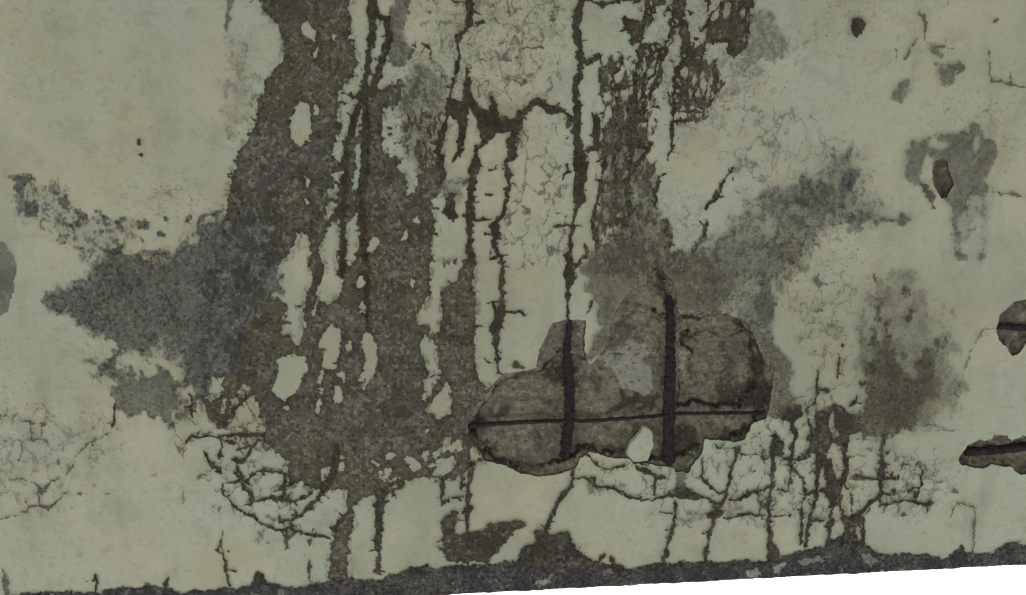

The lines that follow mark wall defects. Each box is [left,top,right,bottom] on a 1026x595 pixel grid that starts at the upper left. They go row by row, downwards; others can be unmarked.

crack [336,0,633,375]
water stain [580,0,797,417]
water stain [780,150,884,265]
water stain [906,124,998,261]
peeling [0,242,17,316]
spalling [996,300,1026,356]
crack [173,374,346,588]
water stain [373,540,385,575]
spalling [436,261,775,572]
crack [596,553,624,571]
crack [540,433,773,566]
spalling [959,435,1026,475]